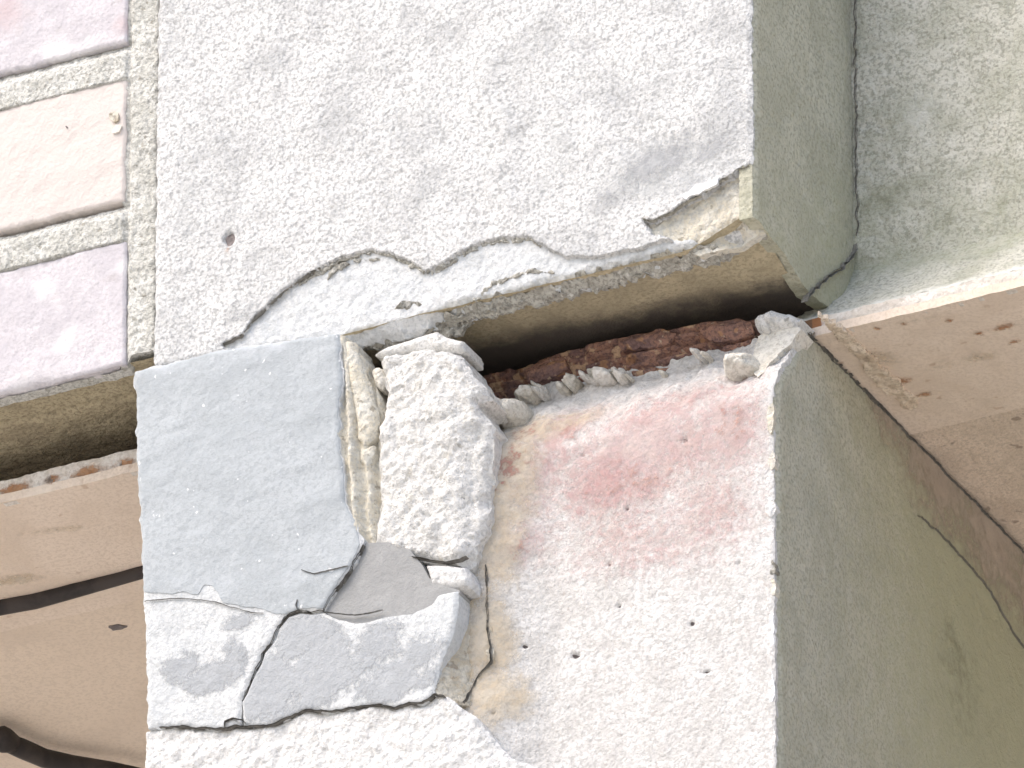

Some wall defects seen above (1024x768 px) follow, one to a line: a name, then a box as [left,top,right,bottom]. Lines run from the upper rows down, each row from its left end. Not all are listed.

crack [801,0,860,303]
corrosion [523,358,573,385]
corrosion [617,329,677,355]
corrosion [699,320,758,347]
peeling [134,166,766,722]
crack [144,545,446,731]
crack [918,515,1024,648]